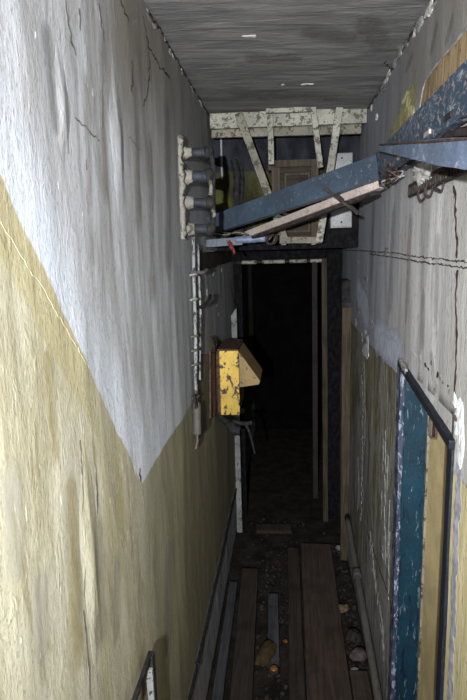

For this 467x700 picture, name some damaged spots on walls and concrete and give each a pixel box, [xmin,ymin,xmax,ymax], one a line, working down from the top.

crack [64,0,80,54]
crack [120,0,170,106]
spalling [378,0,437,96]
peeling [402,91,414,117]
crack [345,185,467,394]
crack [79,440,98,515]
peeling [419,355,464,700]
crack [82,569,90,700]